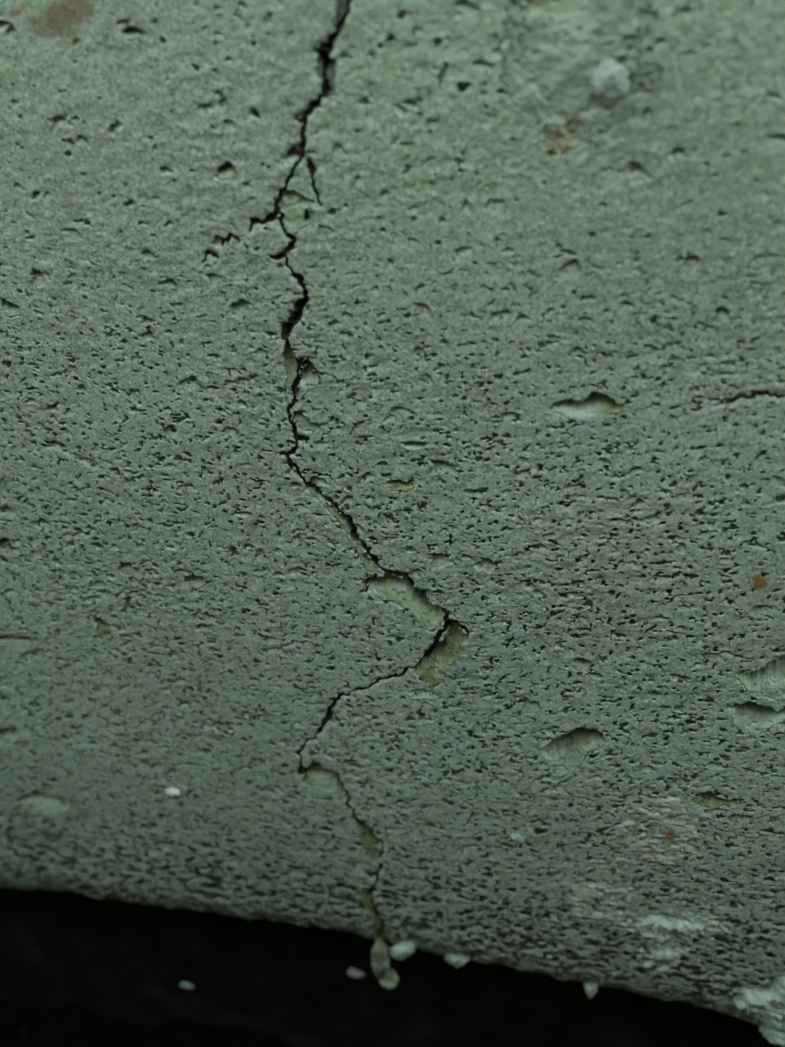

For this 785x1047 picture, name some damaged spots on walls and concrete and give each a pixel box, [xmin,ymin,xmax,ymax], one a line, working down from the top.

crack [203,0,469,936]
spalling [308,487,469,691]
spalling [732,655,785,736]